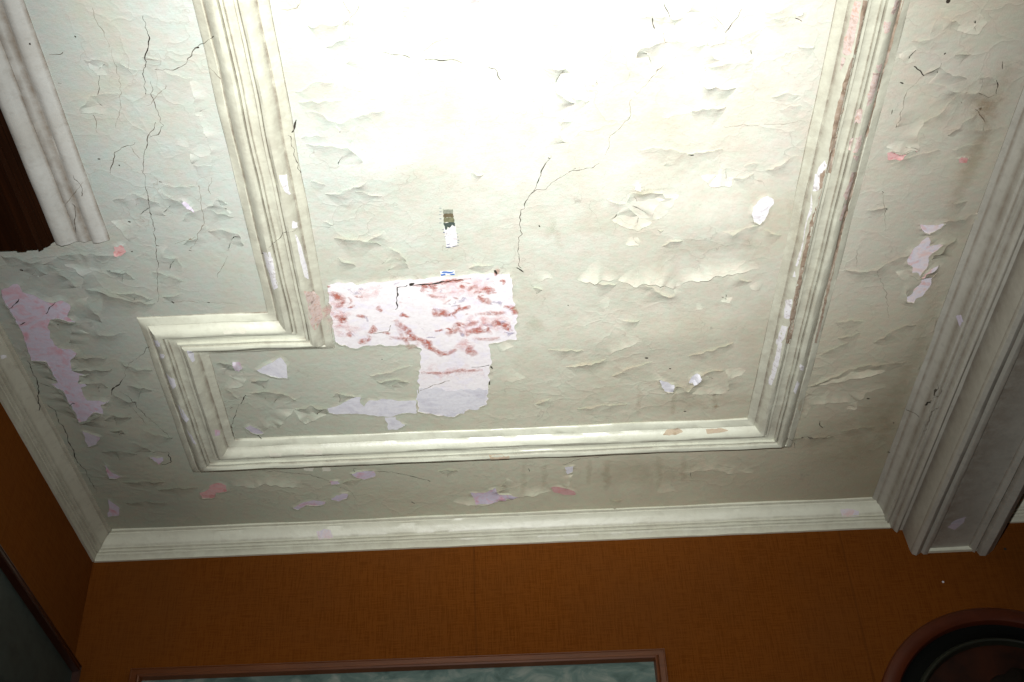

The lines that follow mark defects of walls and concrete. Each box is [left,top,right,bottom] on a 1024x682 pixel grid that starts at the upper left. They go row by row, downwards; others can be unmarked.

crack [92,8,235,304]
peeling [0,49,382,518]
flaking render [292,221,525,417]
peeling [453,464,579,506]
crack [494,4,671,275]
peeling [548,320,746,403]
peeling [768,0,987,421]
peeling [883,54,1008,171]